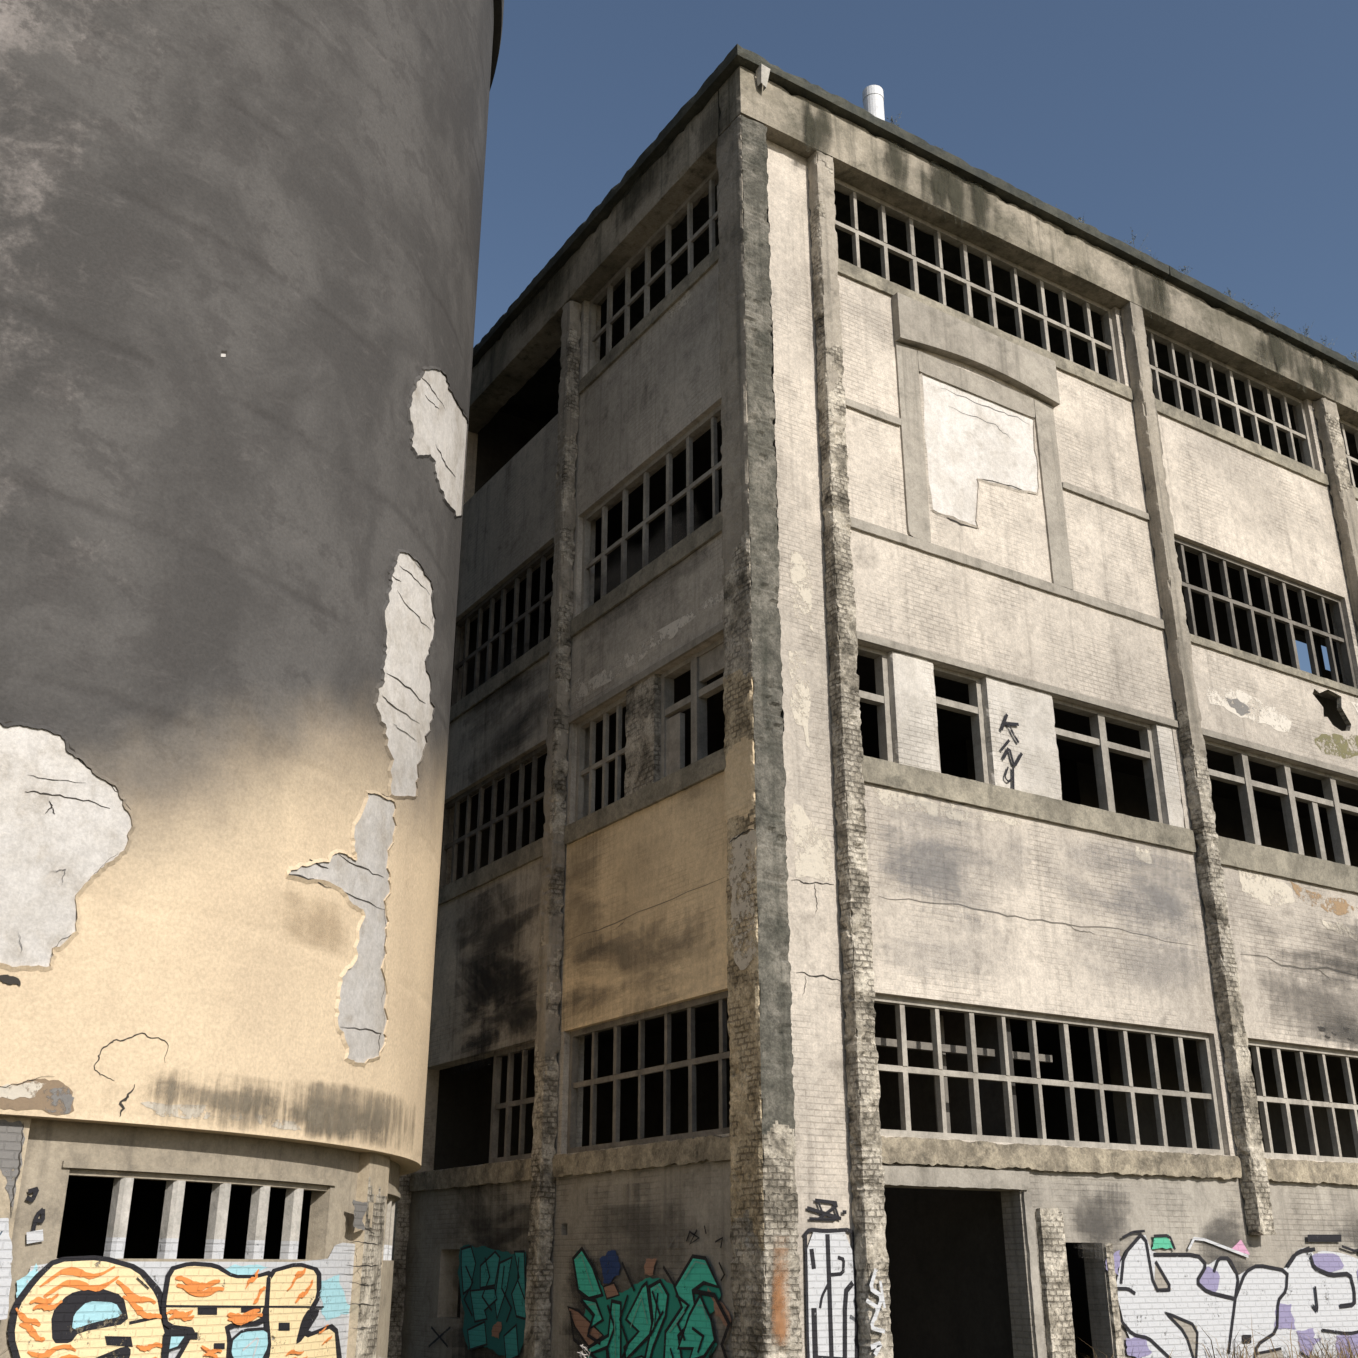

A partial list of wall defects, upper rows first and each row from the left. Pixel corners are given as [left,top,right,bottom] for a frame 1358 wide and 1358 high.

damp [804,104,832,152]
damp [886,139,988,224]
peeling [407,366,468,519]
peeling [919,373,1040,529]
spalling [1206,675,1358,749]
peeling [286,549,436,1068]
peeling [0,719,136,986]
crack [880,896,1194,946]
damp [471,964,535,1056]
crack [94,1033,169,1116]
damp [168,1078,276,1122]
damp [294,1082,414,1142]